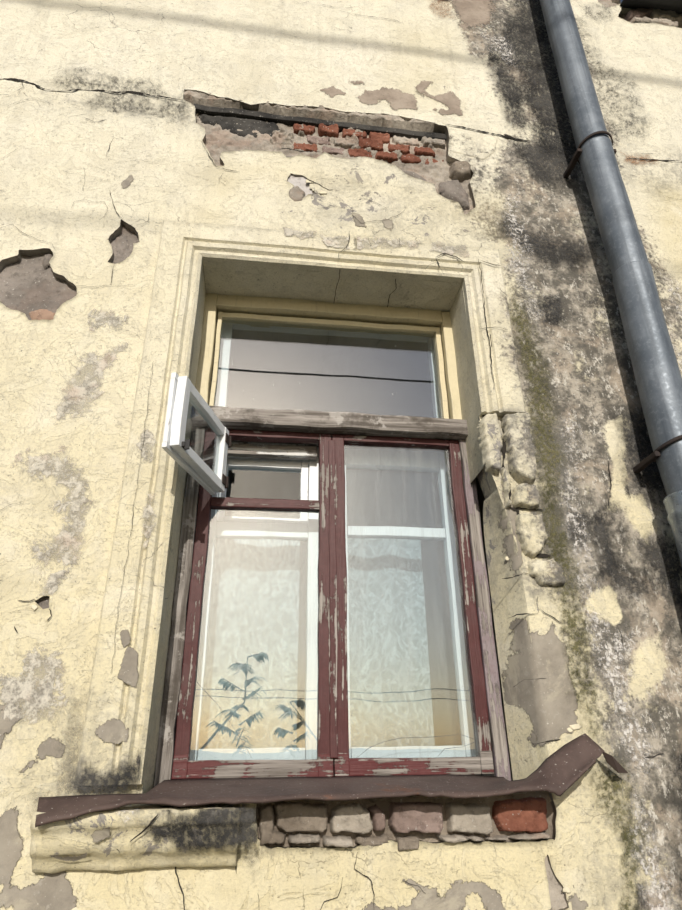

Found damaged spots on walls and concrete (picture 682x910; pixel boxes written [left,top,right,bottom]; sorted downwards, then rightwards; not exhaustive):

crack [1,78,184,105]
flaking render [184,80,498,215]
water stain [487,0,580,187]
flaking render [0,254,77,320]
flaking render [477,412,565,587]
water stain [567,483,682,612]
water stain [621,413,667,497]
peeling [501,618,582,748]
water stain [587,612,650,769]
peeling [0,806,87,910]
crack [175,867,185,910]
water stain [146,804,257,852]